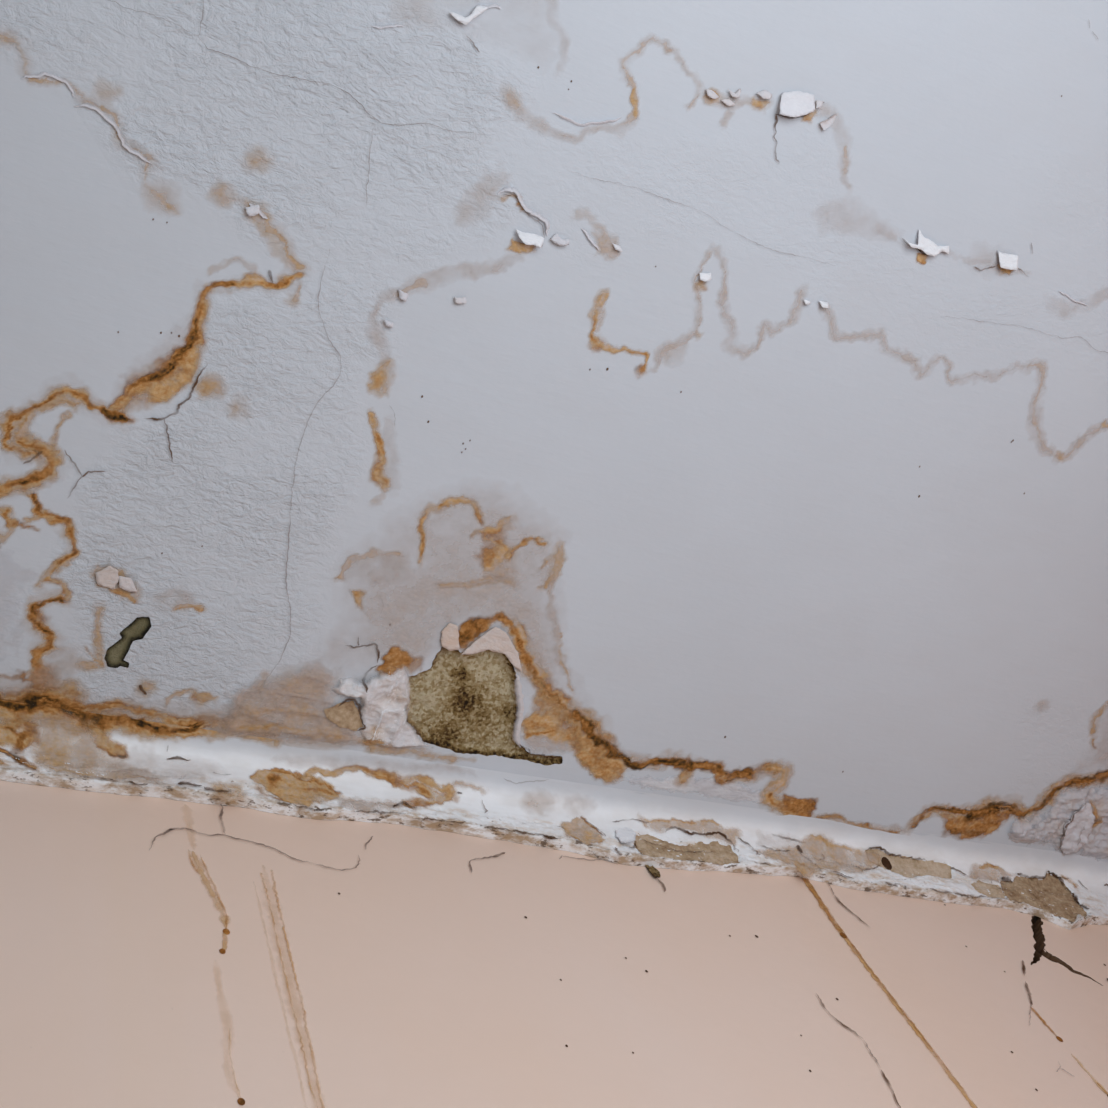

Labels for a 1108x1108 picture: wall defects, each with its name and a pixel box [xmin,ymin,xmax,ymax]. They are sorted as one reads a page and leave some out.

leakage [0,203,457,782]
spalling [104,617,151,668]
spalling [324,623,563,765]
leakage [376,496,873,829]
crack [149,756,644,873]
peeling [615,819,740,891]
leakage [911,770,1108,839]
peeling [971,863,1089,922]
rust [802,878,933,1051]
crack [1022,916,1108,1018]
crack [817,995,901,1108]
rust [945,1070,977,1108]